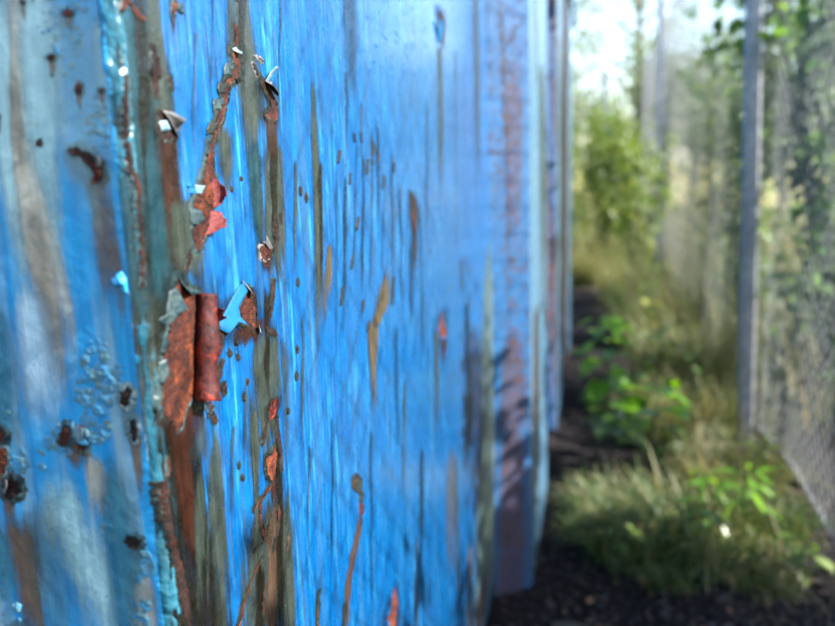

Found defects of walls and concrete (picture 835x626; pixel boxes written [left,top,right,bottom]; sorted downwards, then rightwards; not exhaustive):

peeling [153,106,186,169]
peeling [188,43,243,257]
peeling [259,66,279,157]
peeling [257,236,273,271]
corrosion [408,190,417,264]
corrosion [0,424,12,491]
peeling [115,381,143,486]
corrosion [171,432,195,555]
peeling [151,270,267,452]
corrosion [263,442,278,626]
corrosion [267,396,290,430]
corrosion [343,476,365,626]